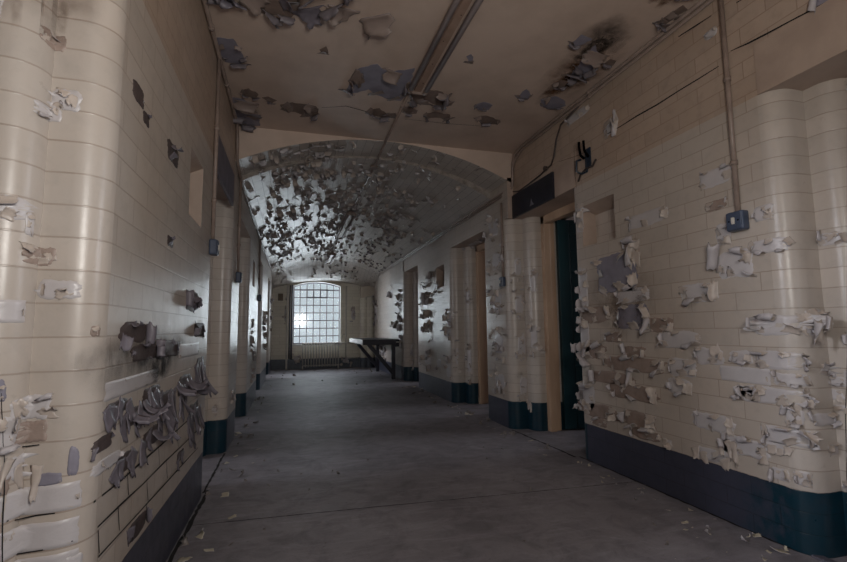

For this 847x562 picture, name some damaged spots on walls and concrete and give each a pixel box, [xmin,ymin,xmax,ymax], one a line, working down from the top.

peeling [206,0,395,40]
peeling [561,35,616,87]
peeling [338,64,455,123]
peeling [0,194,39,222]
peeling [240,141,406,285]
peeling [19,241,57,266]
peeling [250,298,287,361]
peeling [386,286,403,349]
peeling [418,271,473,385]
peeling [486,285,508,365]
peeling [570,223,847,483]
peeling [0,289,218,562]